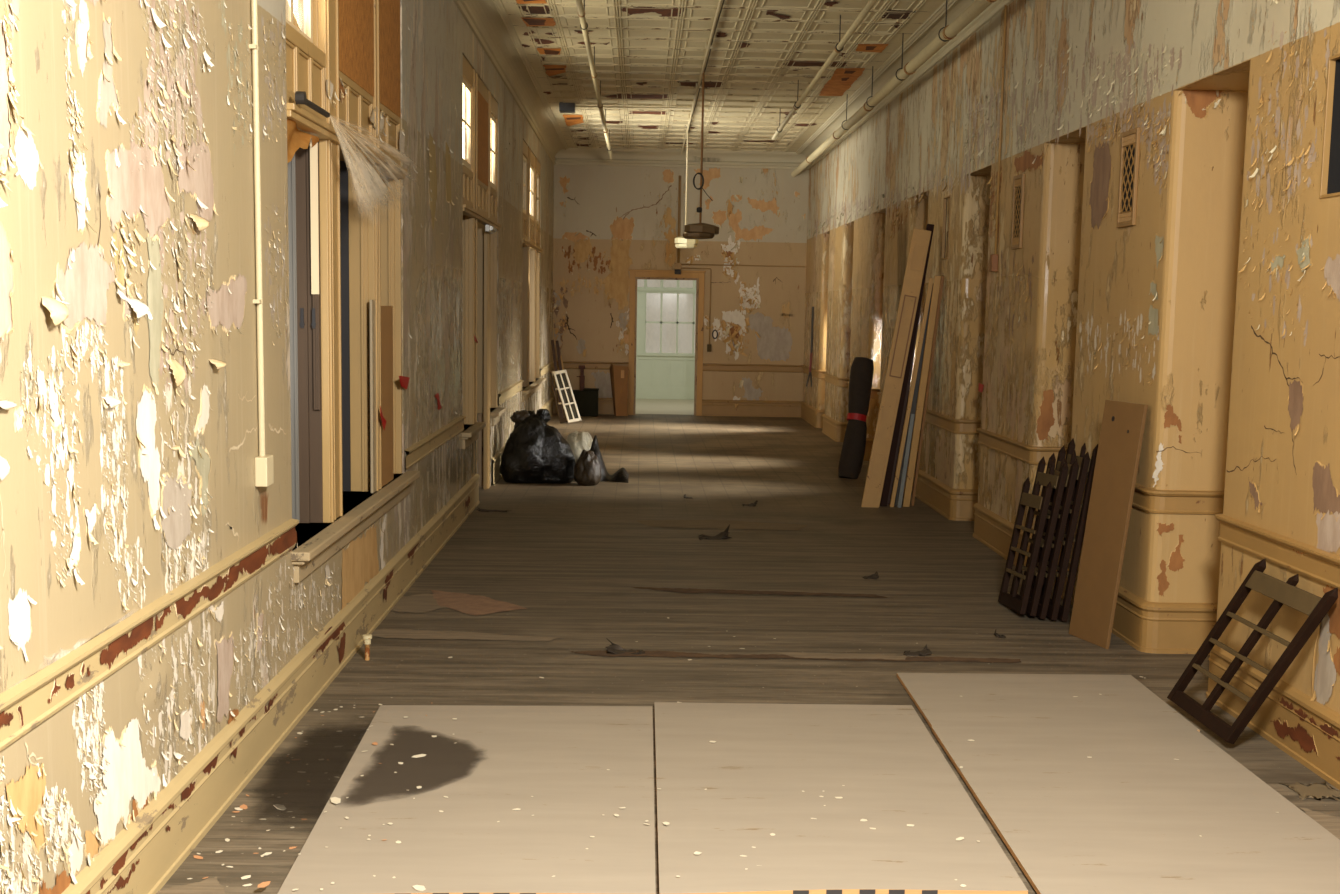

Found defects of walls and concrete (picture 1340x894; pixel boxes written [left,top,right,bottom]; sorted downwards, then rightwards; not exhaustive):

peeling [1239,0,1340,346]
peeling [0,0,393,894]
peeling [553,216,635,356]
peeling [591,370,613,398]
peeling [694,168,793,363]
peeling [1036,389,1055,441]
peeling [1076,233,1164,385]
peeling [1152,404,1182,488]
crack [1251,325,1338,386]
peeling [1288,379,1304,435]
peeling [1293,460,1340,556]